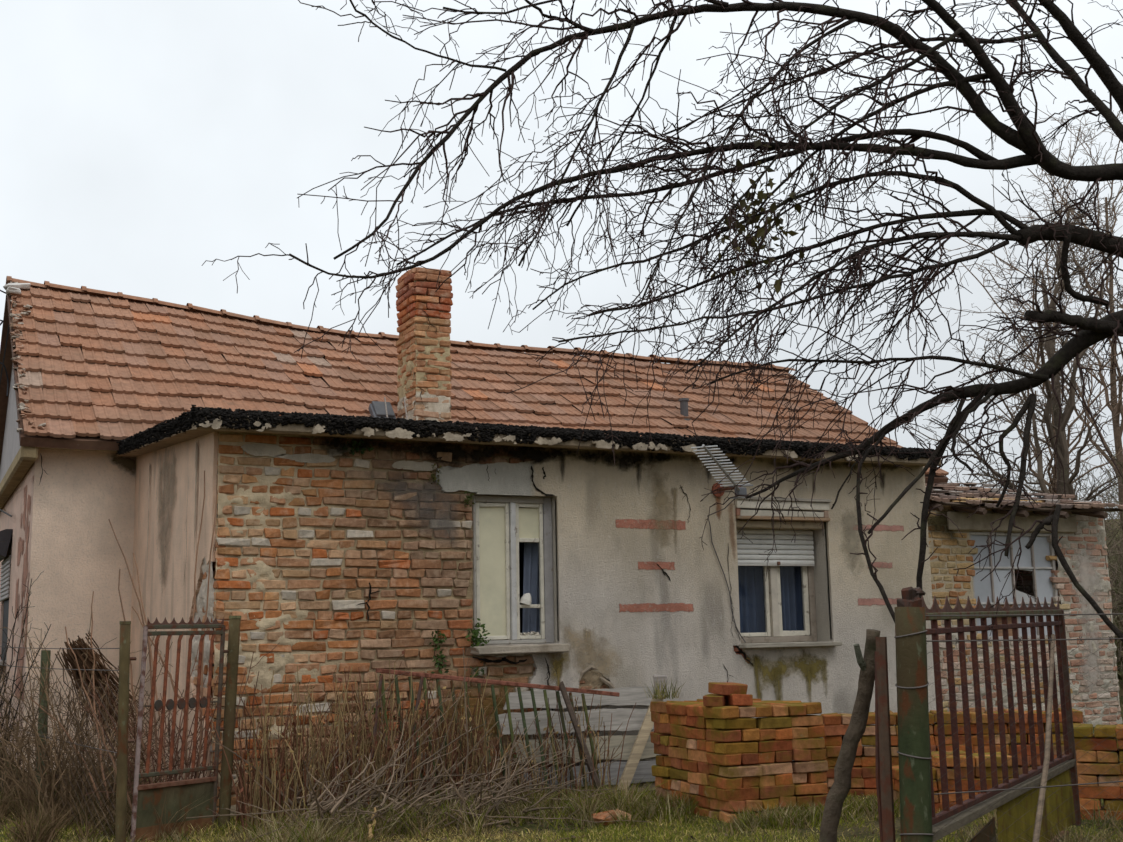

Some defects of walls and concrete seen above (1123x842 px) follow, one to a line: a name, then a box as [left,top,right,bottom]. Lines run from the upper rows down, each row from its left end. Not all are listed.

peeling [591,440,697,453]
damp [112,454,175,580]
flaking render [190,418,562,819]
damp [753,656,782,700]